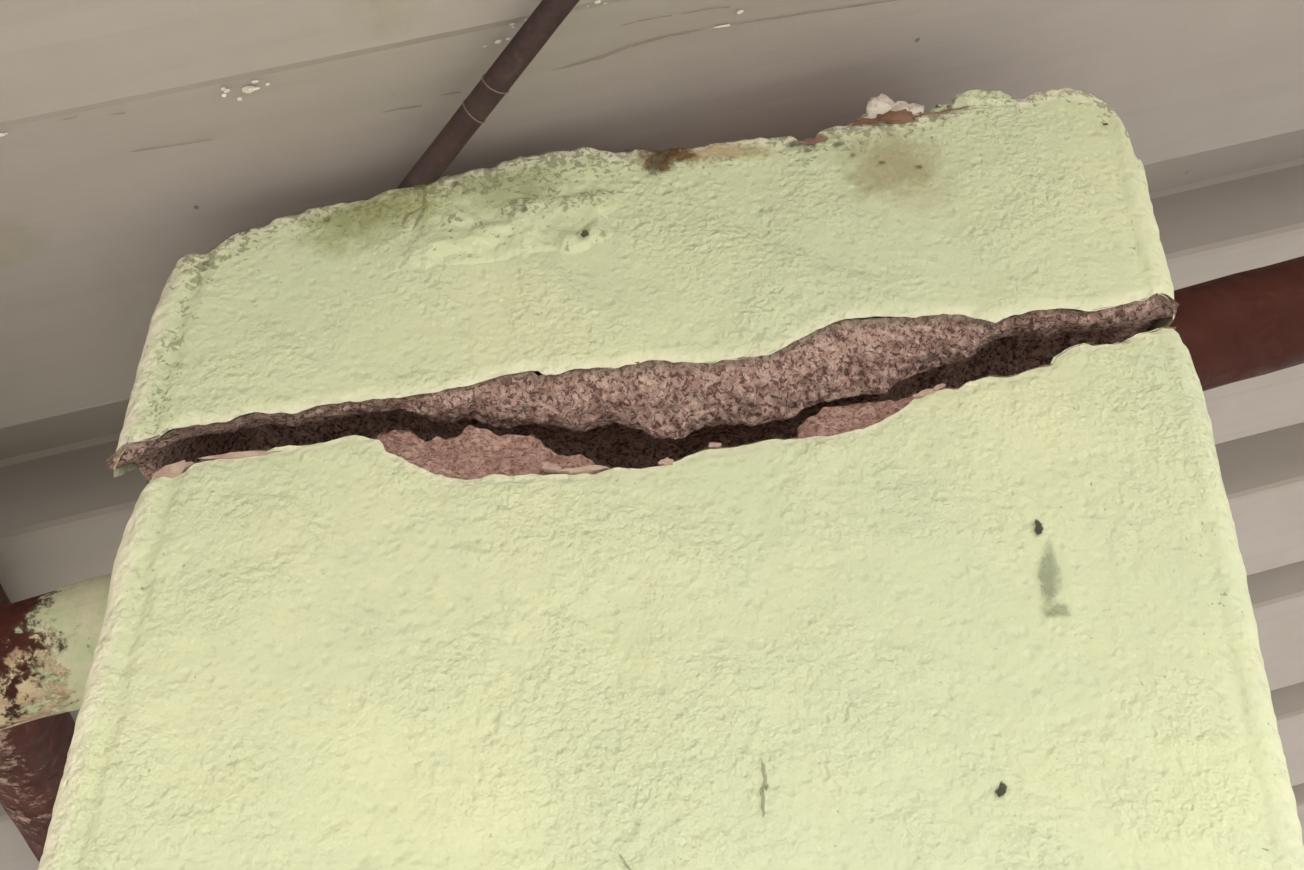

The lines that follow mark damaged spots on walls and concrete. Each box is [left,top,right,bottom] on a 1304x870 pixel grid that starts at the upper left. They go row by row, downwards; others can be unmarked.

crack [106,293,1179,483]